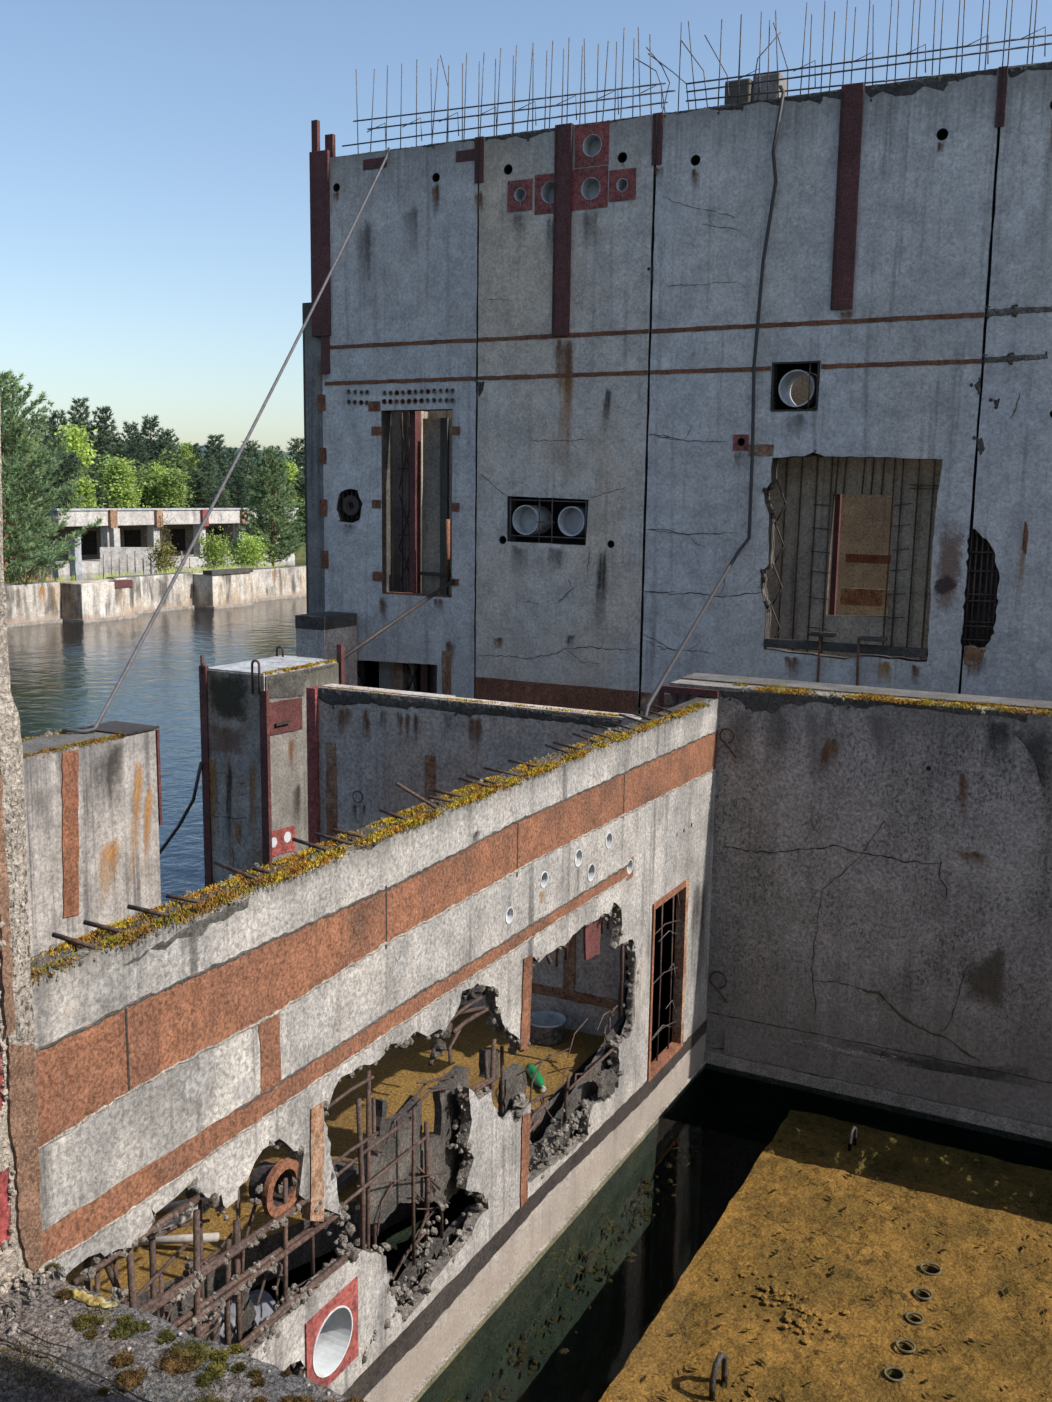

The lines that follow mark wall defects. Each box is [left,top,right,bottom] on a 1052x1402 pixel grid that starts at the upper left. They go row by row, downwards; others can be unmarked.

peeling [334,0,1052,158]
rust [556,340,572,425]
spalling [973,436,985,456]
spalling [970,351,1048,409]
spalling [985,304,1052,319]
spalling [759,450,936,660]
spalling [961,529,1000,667]
rust [134,765,151,837]
peeling [30,664,1051,983]
spalling [35,730,718,1150]
crack [723,820,982,1064]
spalling [0,864,680,1364]